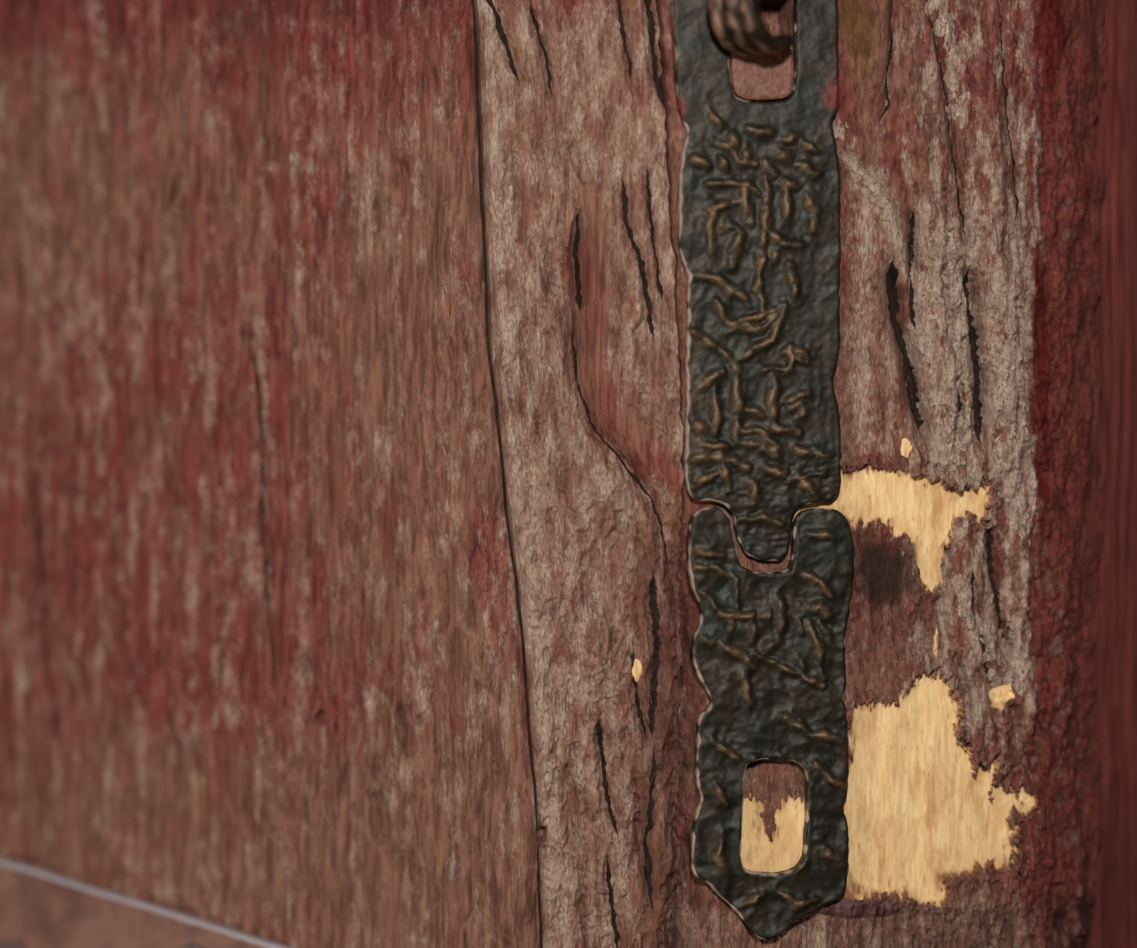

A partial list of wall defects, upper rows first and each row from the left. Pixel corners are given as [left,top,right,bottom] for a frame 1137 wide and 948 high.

crack [878,0,893,125]
crack [925,0,966,239]
crack [886,208,924,435]
crack [956,266,983,447]
peeling [792,232,1083,948]
peeling [741,790,805,872]